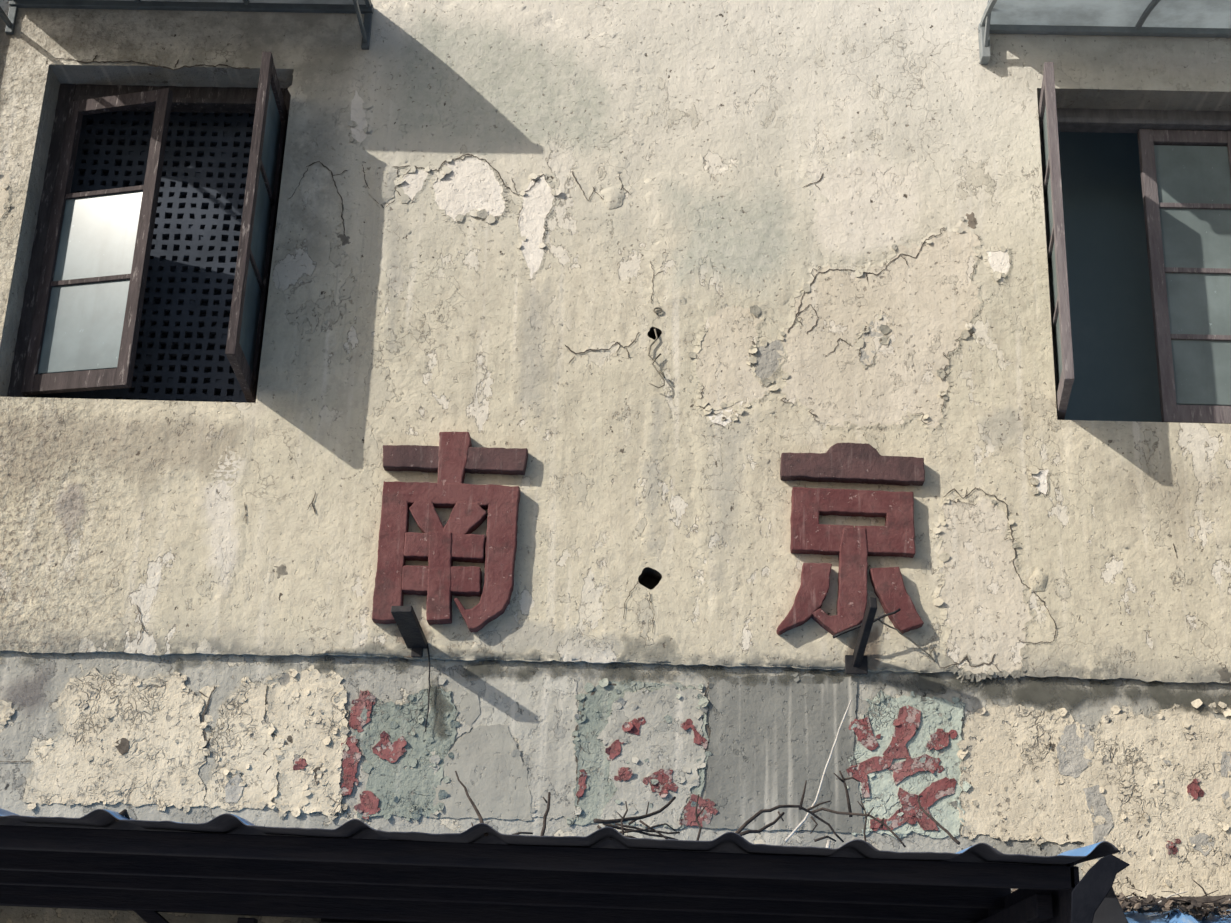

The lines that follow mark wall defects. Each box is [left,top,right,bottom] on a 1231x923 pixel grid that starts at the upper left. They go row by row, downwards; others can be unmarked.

leakage [288,0,644,195]
crack [285,153,542,237]
peeling [394,155,562,281]
crack [572,171,636,202]
crack [565,261,662,364]
crack [783,241,926,356]
peeling [929,495,1035,683]
crack [938,481,1065,672]
peeling [23,665,1231,899]